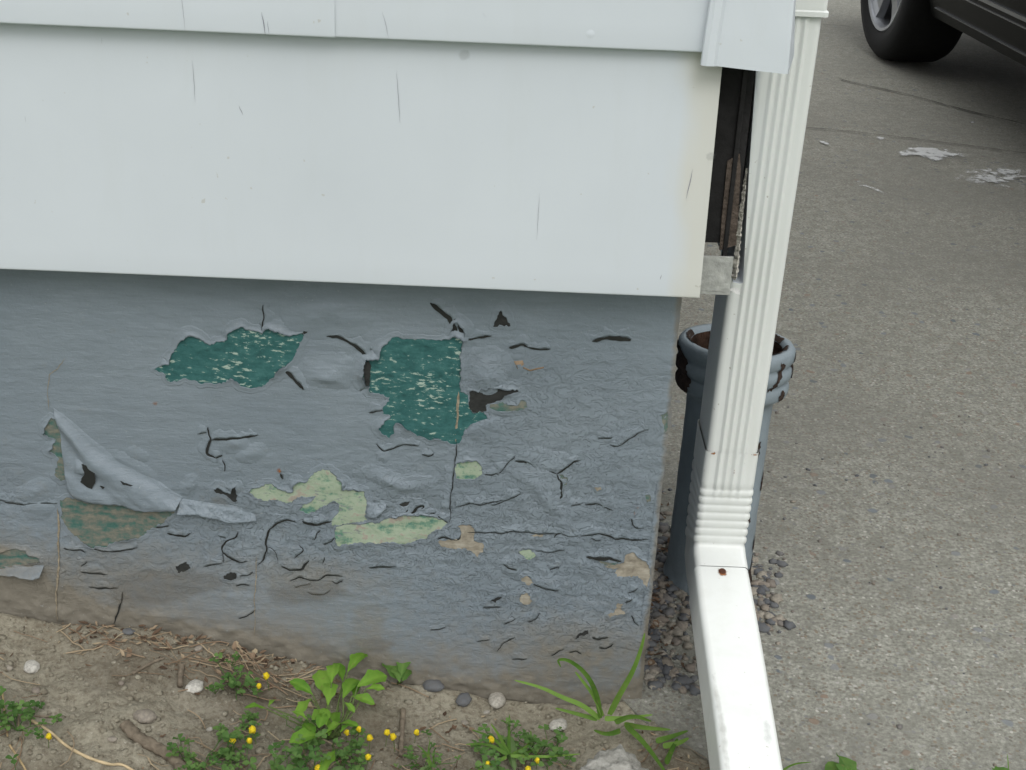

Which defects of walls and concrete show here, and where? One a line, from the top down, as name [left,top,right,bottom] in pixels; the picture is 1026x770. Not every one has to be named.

peeling [148,318,309,394]
crack [430,299,551,350]
peeling [489,301,516,332]
crack [590,326,632,342]
peeling [352,313,534,484]
peeling [38,412,489,560]
peeling [0,544,49,580]
spalling [170,558,195,577]
spalling [486,546,540,608]
spalling [594,547,654,591]